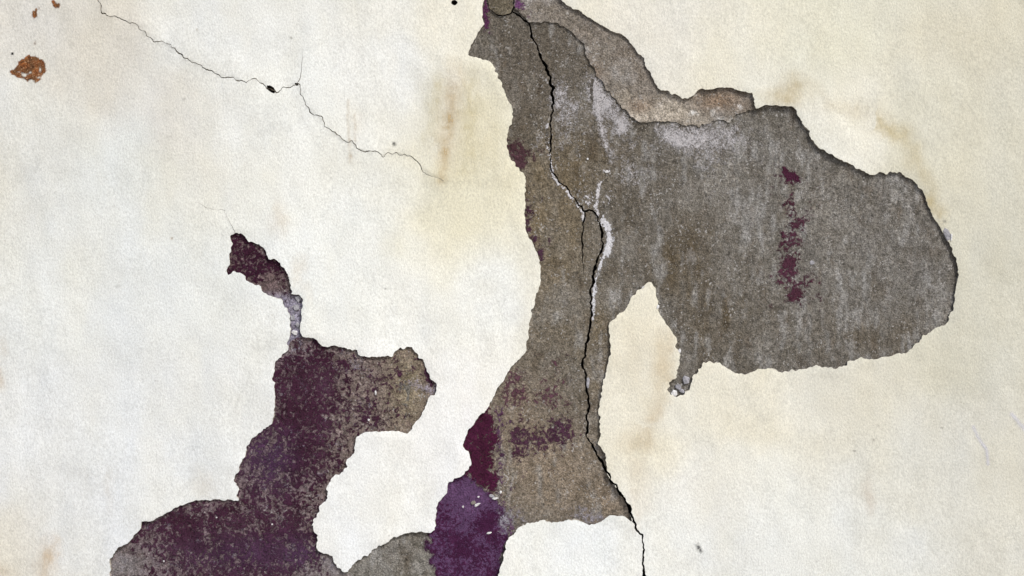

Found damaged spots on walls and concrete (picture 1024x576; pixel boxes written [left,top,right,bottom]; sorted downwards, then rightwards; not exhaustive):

corrosion [10,43,46,83]
crack [97,0,442,180]
peeling [110,233,437,576]
crack [487,0,646,576]
peeling [462,0,958,563]